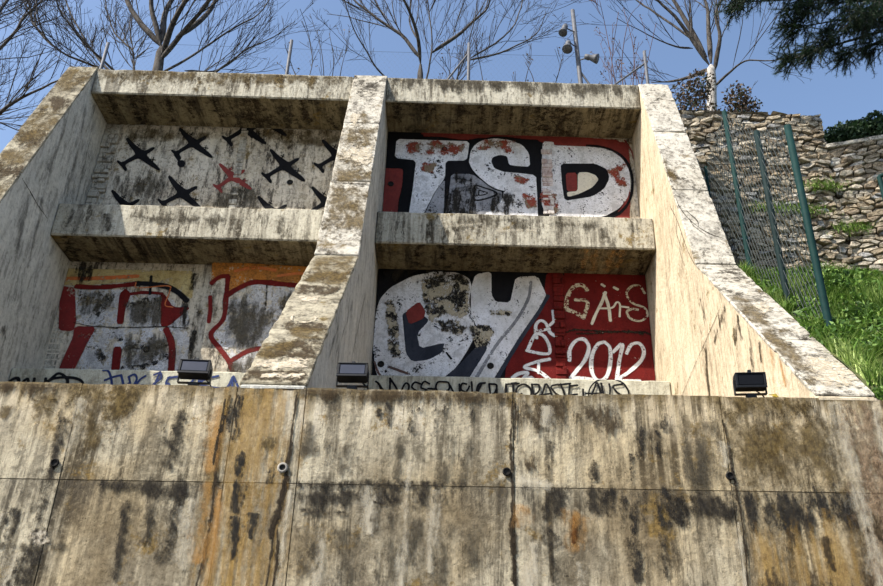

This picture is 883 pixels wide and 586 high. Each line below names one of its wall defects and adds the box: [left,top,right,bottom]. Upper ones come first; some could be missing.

spalling [405,139,515,173]
spalling [514,176,559,214]
spalling [607,163,627,187]
water stain [226,271,509,440]
spalling [385,300,402,358]
spalling [421,272,512,348]
water stain [0,417,69,586]
water stain [99,477,191,580]
rust [194,389,286,586]
water stain [287,436,471,586]
crack [508,394,518,586]
water stain [586,415,883,586]